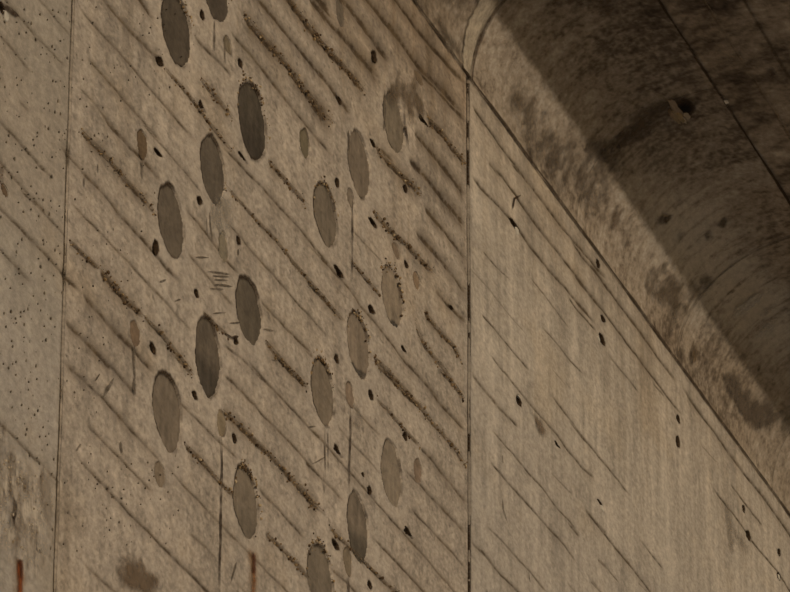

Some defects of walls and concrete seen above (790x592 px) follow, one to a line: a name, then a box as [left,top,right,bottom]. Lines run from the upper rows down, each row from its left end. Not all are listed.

spalling [667,99,695,124]
leakage [725,373,790,431]
leakage [120,559,158,592]